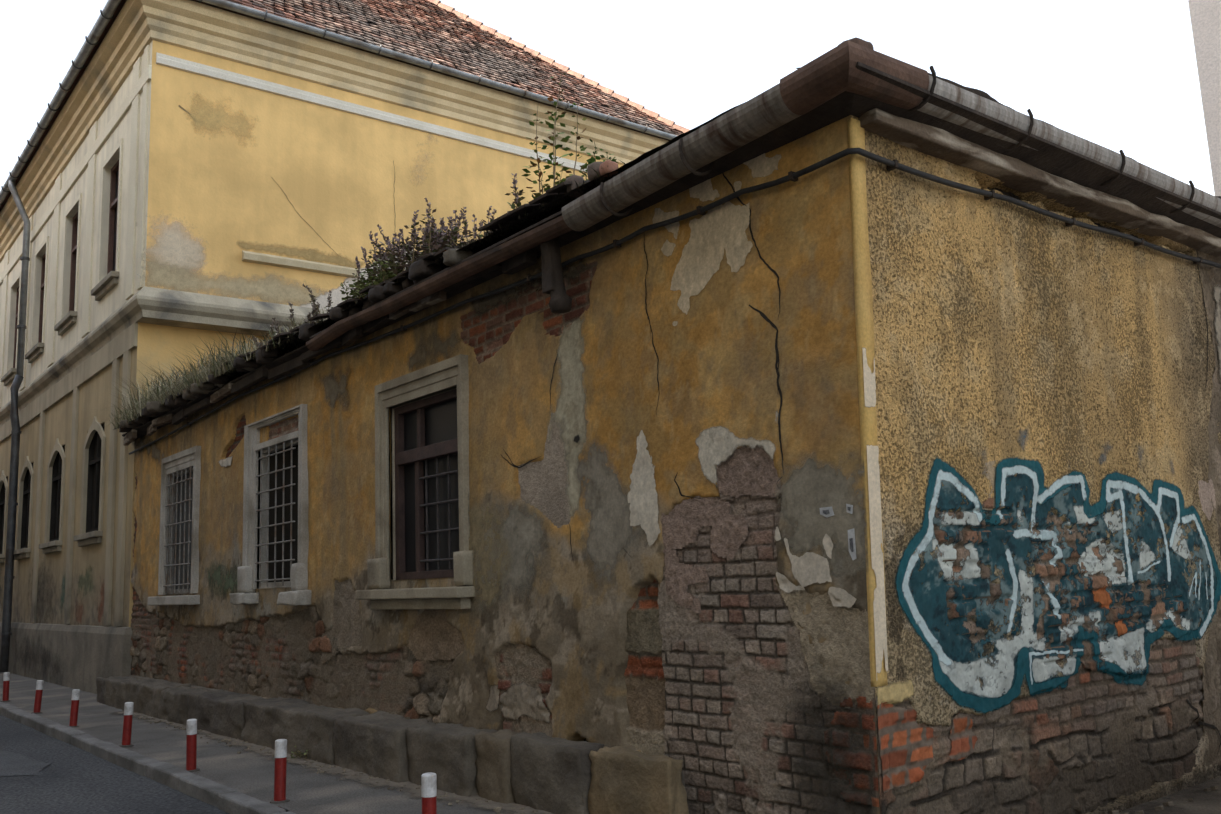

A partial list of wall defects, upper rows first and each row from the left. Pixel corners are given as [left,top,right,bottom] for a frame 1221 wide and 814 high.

water stain [146,261,322,306]
water stain [238,242,362,269]
flaking render [460,261,598,364]
crack [644,237,659,415]
peeling [652,153,781,326]
crack [722,173,784,489]
peeling [862,347,876,407]
flaking render [1196,250,1221,556]
flaking render [130,587,455,724]
flaking render [624,445,1221,814]